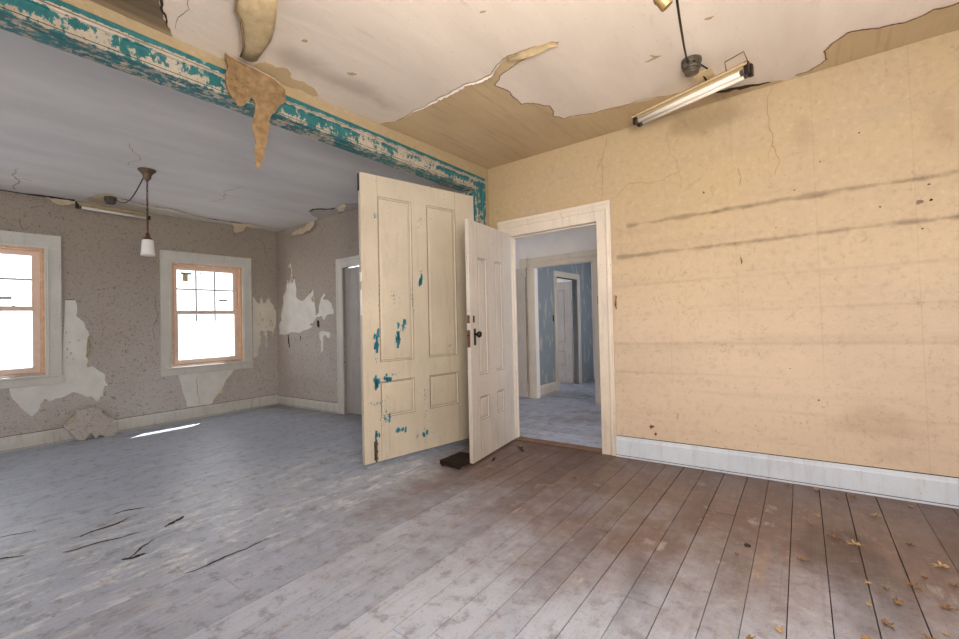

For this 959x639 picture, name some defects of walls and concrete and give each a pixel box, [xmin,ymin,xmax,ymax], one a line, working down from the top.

peeling [90,0,173,37]
peeling [225,0,318,169]
peeling [381,41,678,169]
peeling [655,80,784,120]
peeling [795,2,959,77]
peeling [9,299,107,416]
peeling [178,369,234,407]
peeling [253,263,334,358]